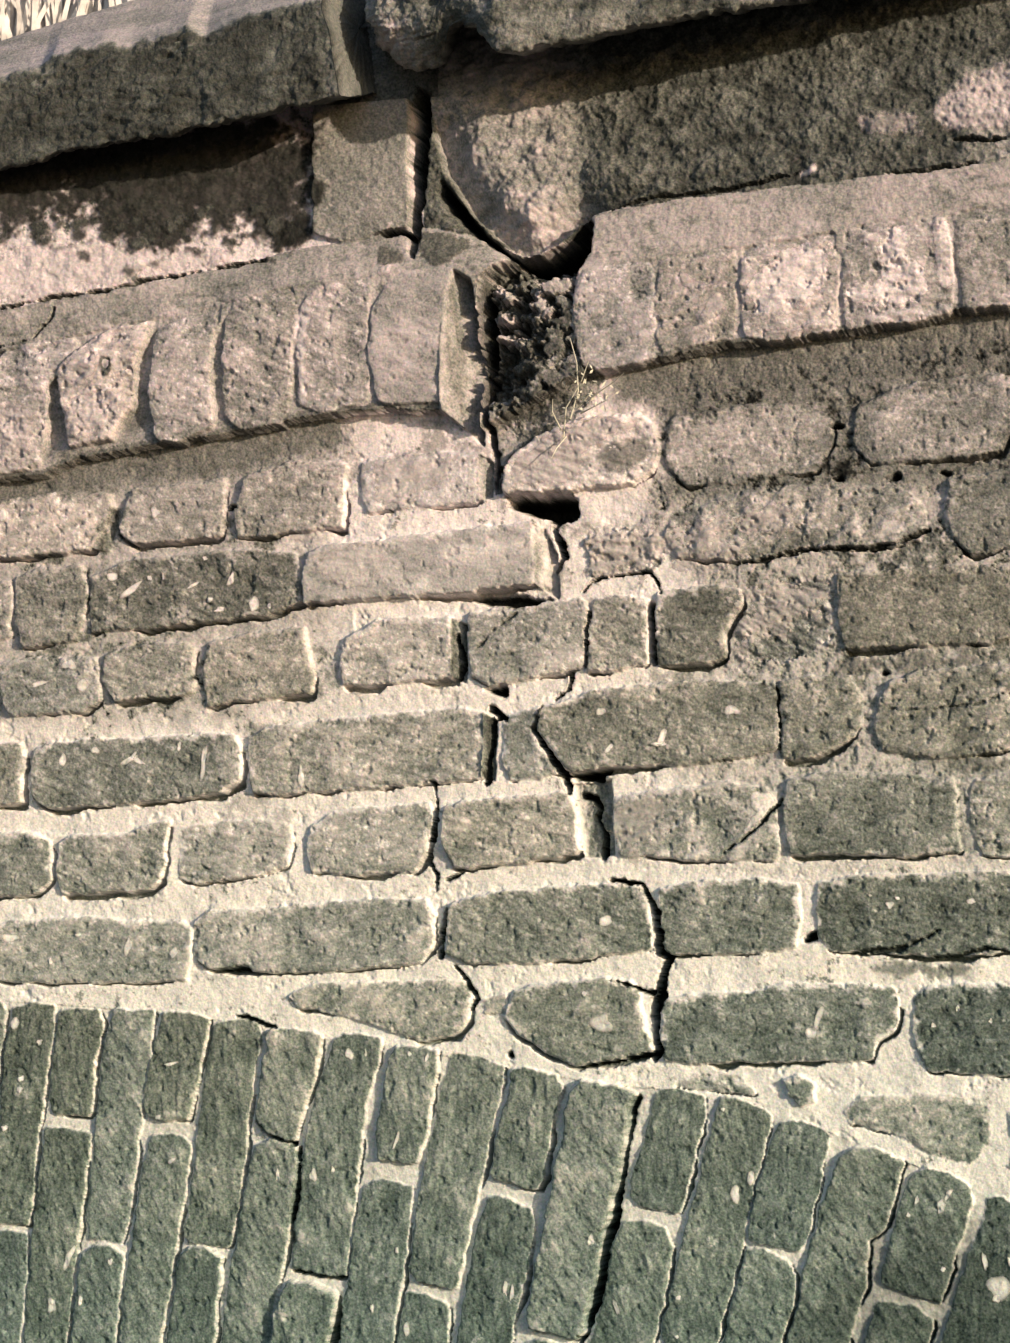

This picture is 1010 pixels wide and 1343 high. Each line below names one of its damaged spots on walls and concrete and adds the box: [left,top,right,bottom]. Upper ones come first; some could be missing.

crack [454,569,679,1069]
crack [722,798,784,855]
crack [576,1095,643,1343]